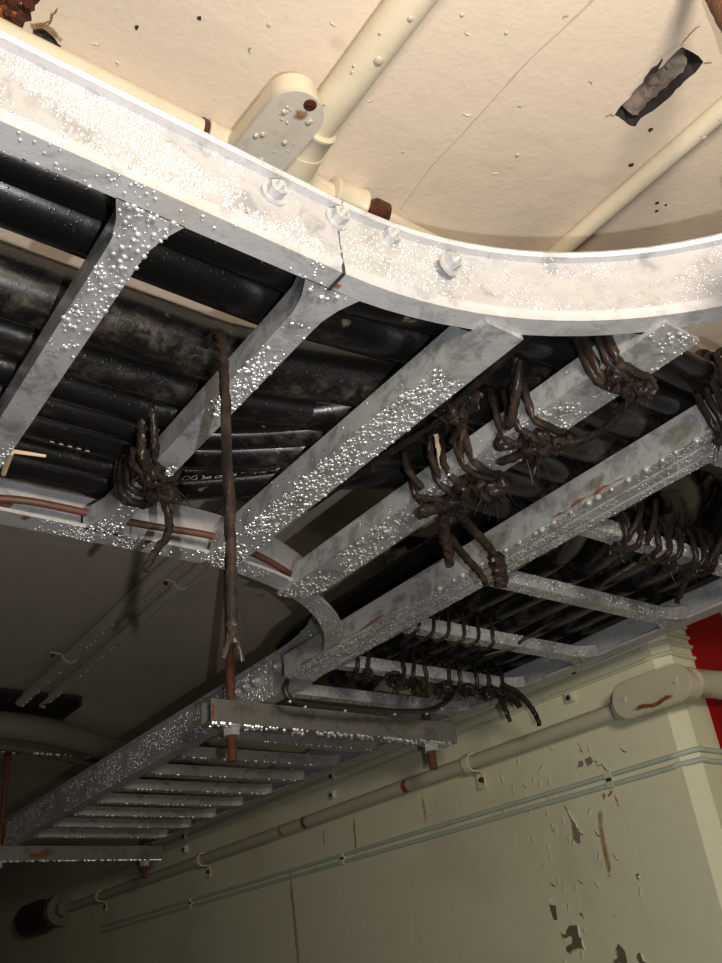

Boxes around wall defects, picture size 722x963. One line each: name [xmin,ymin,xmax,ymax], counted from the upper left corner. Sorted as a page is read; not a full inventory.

peeling [577,745,609,771]
peeling [542,806,600,869]
peeling [547,898,586,960]
peeling [613,944,647,963]